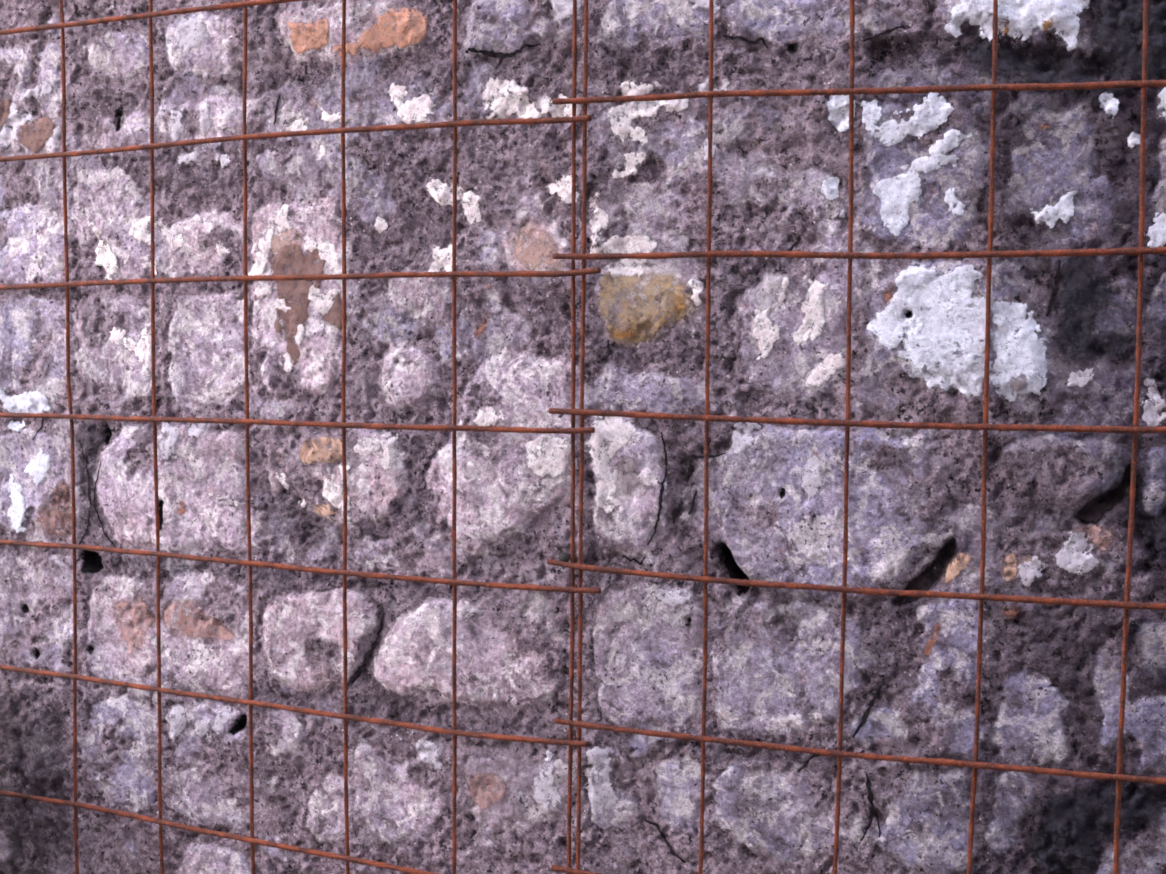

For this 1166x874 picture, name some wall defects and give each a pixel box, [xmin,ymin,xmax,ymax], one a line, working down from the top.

rust [598,273,695,344]
crack [622,432,726,565]